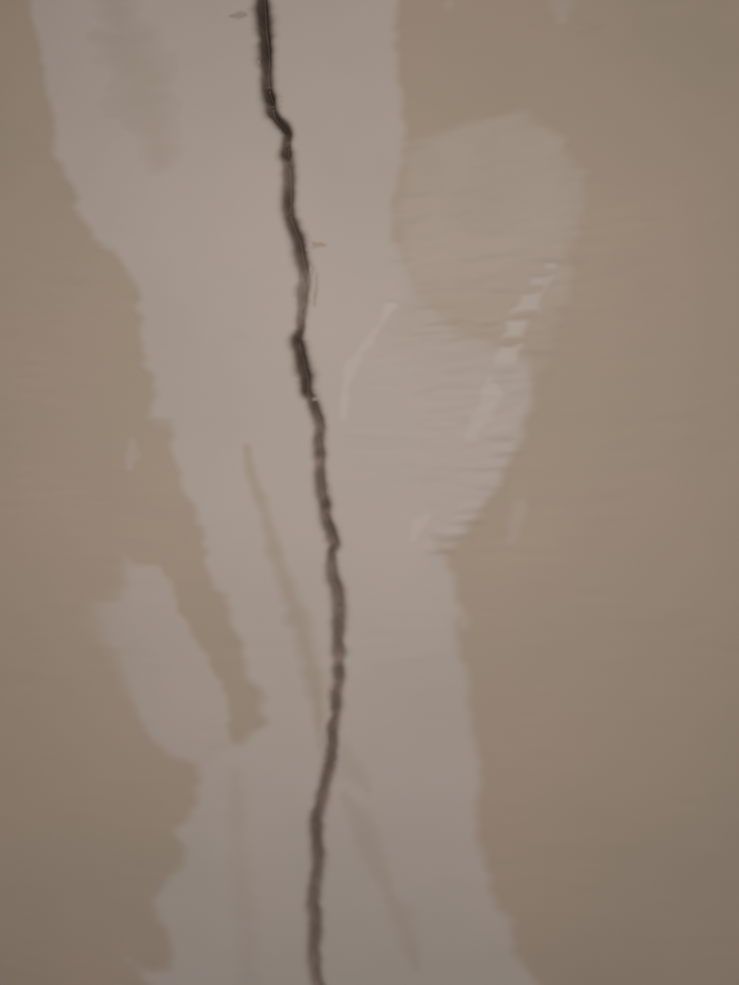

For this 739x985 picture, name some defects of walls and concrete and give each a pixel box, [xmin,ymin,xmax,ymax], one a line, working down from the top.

crack [245,0,353,985]